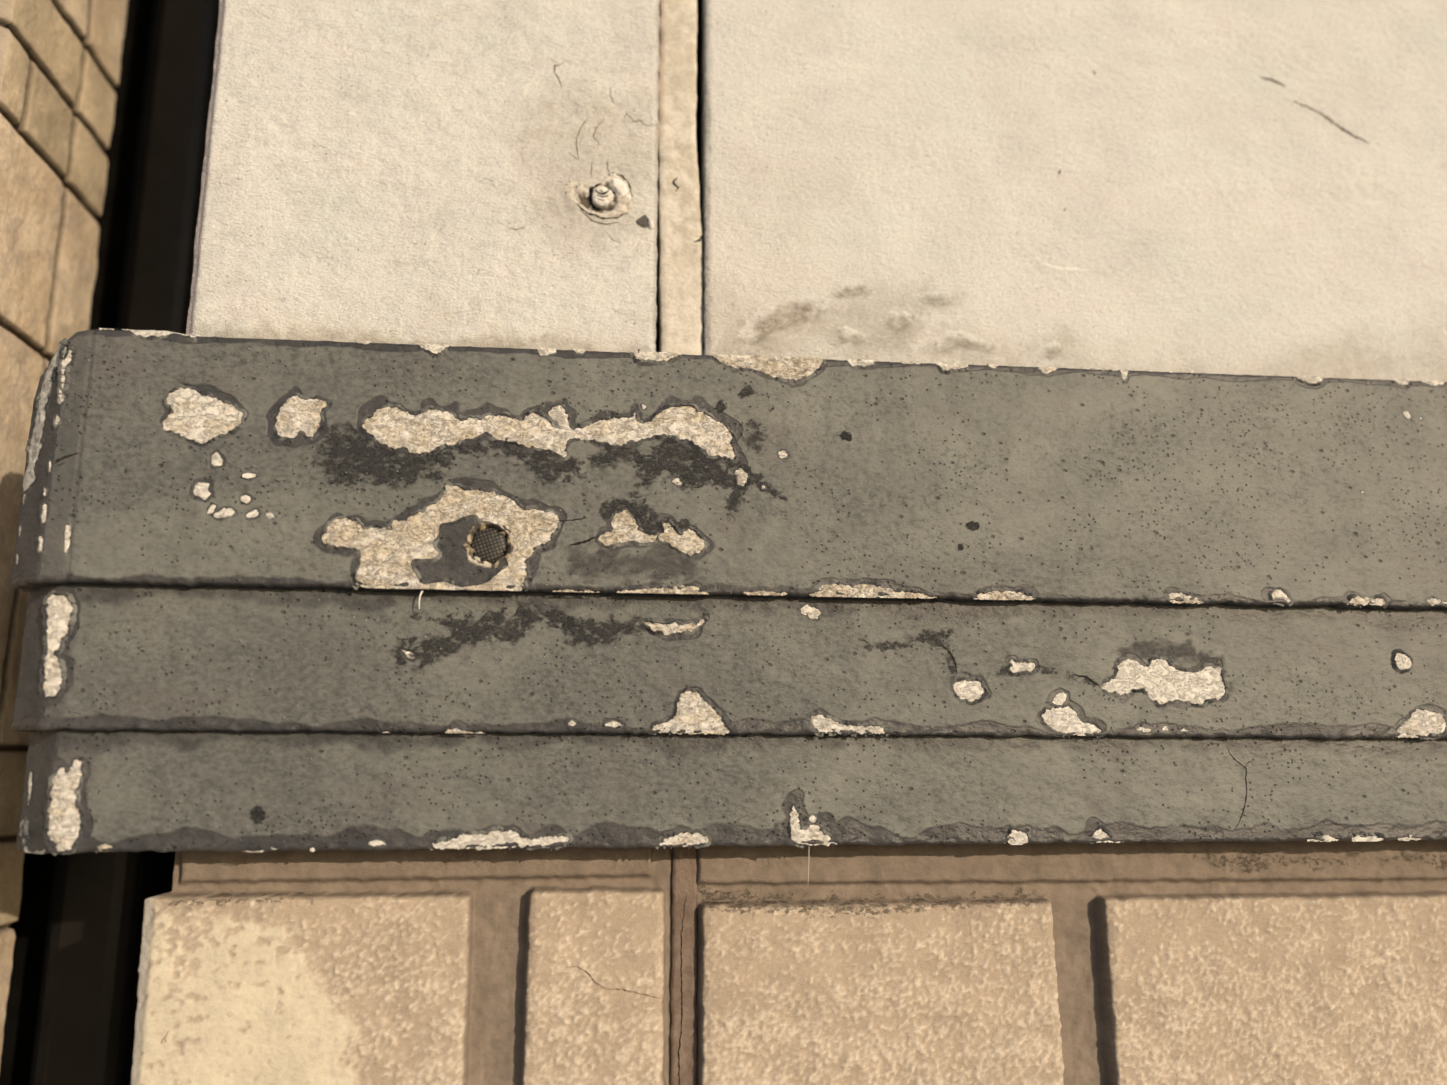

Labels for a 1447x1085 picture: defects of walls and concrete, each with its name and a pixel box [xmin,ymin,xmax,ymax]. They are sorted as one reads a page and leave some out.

peeling [273,393,330,442]
peeling [161,384,275,520]
peeling [360,402,767,491]
peeling [319,482,562,592]
peeling [594,507,707,559]
peeling [39,590,78,701]
peeling [1098,656,1228,708]
peeling [649,687,732,735]
peeling [1392,705,1447,740]
peeling [19,757,87,856]
peeling [429,825,574,851]
peeling [786,803,840,848]